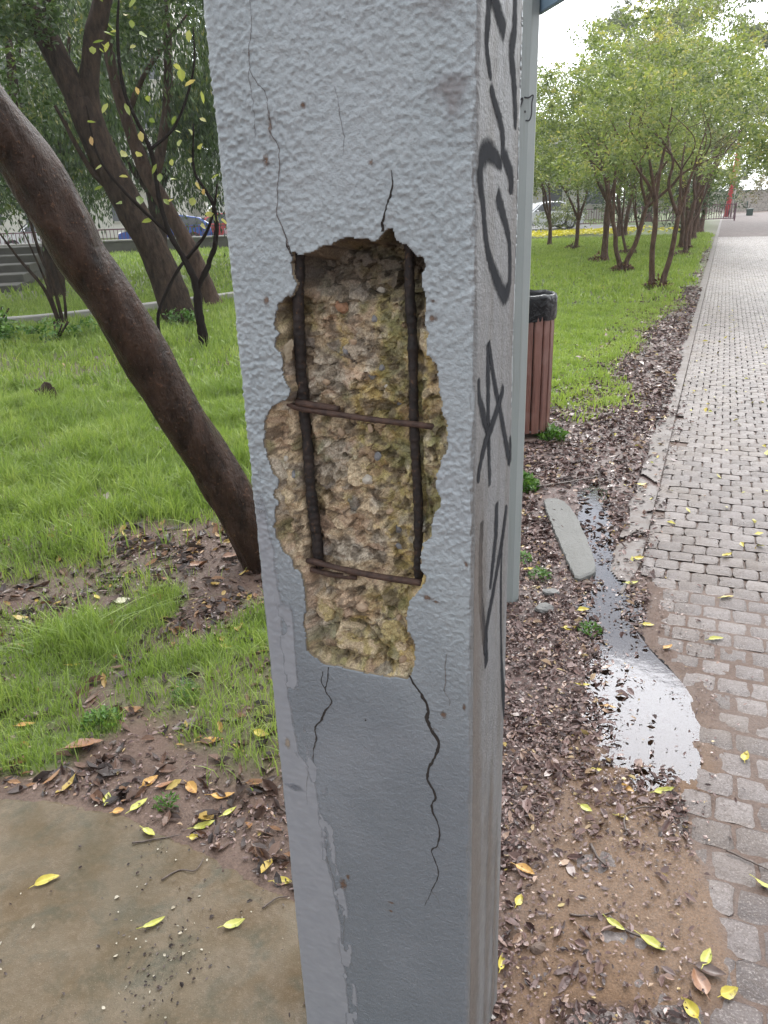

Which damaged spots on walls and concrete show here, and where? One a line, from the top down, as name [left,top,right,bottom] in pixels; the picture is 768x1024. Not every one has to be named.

crack [248,6,294,257]
crack [381,170,393,232]
crack [306,667,332,797]
spalling [256,228,448,1024]
crack [408,654,450,908]